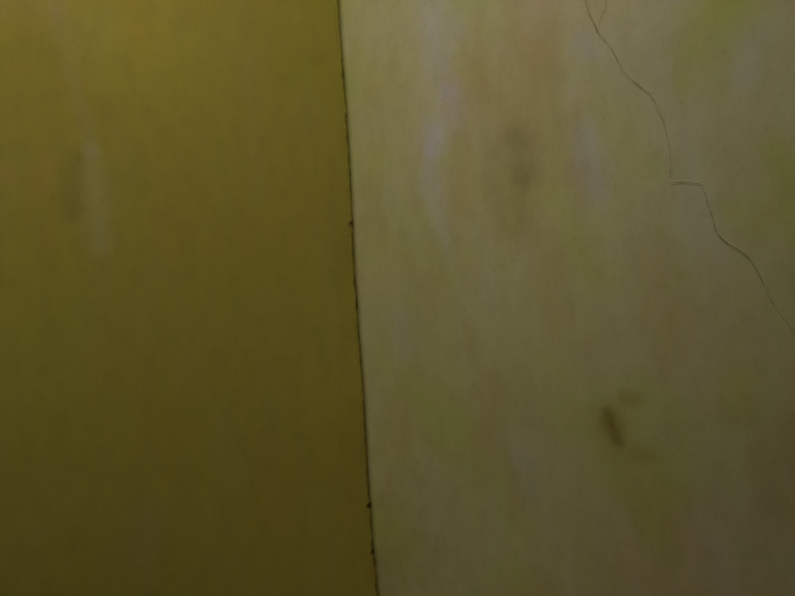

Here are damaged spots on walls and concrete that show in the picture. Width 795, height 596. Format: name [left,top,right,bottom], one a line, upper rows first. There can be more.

crack [584,0,795,335]